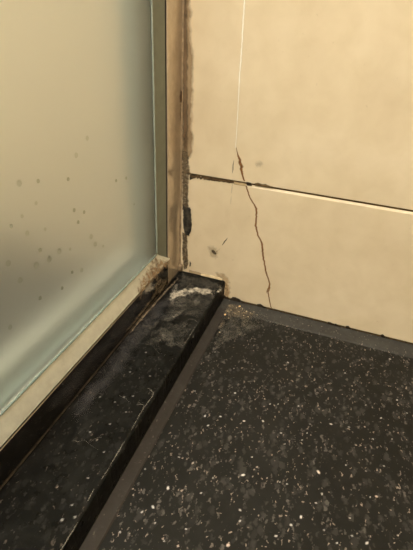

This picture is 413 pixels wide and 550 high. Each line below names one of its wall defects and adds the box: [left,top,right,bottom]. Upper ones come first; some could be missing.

water stain [182,0,192,269]
crack [236,148,272,309]